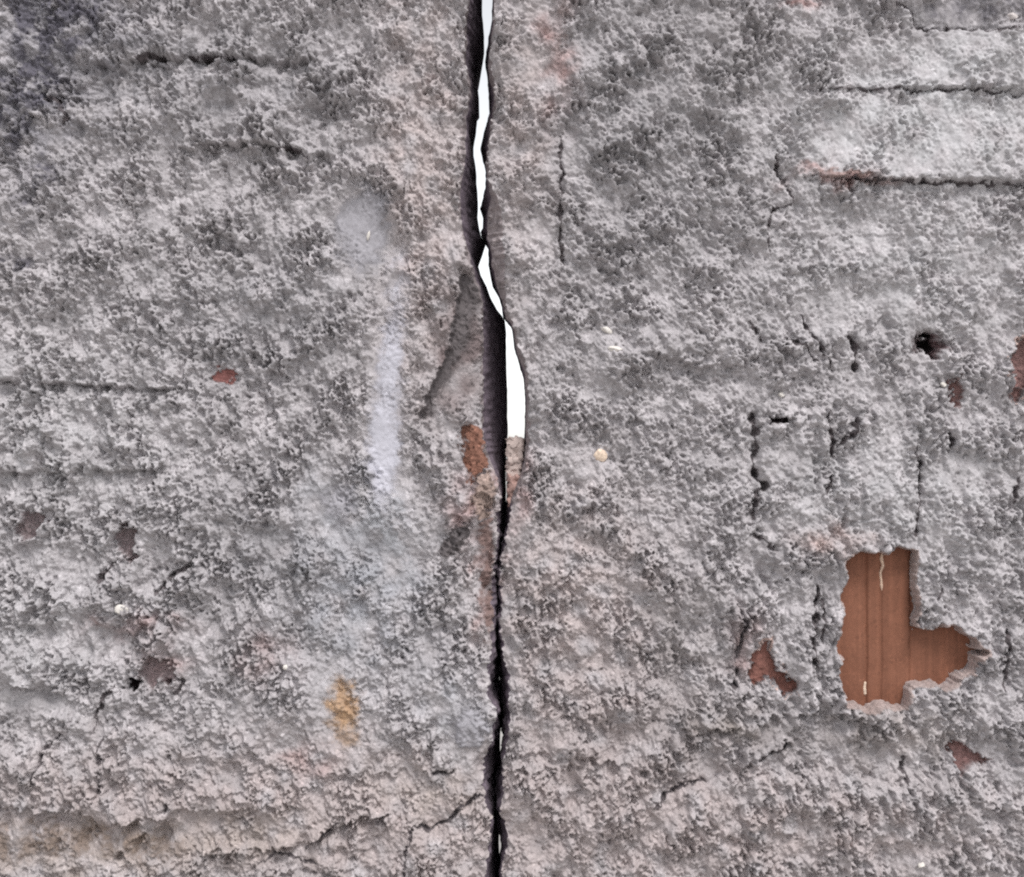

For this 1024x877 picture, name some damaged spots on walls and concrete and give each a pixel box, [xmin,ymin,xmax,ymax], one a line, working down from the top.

crack [767,153,1022,255]
crack [403,0,531,877]
spalling [746,636,799,700]
spalling [836,546,992,715]